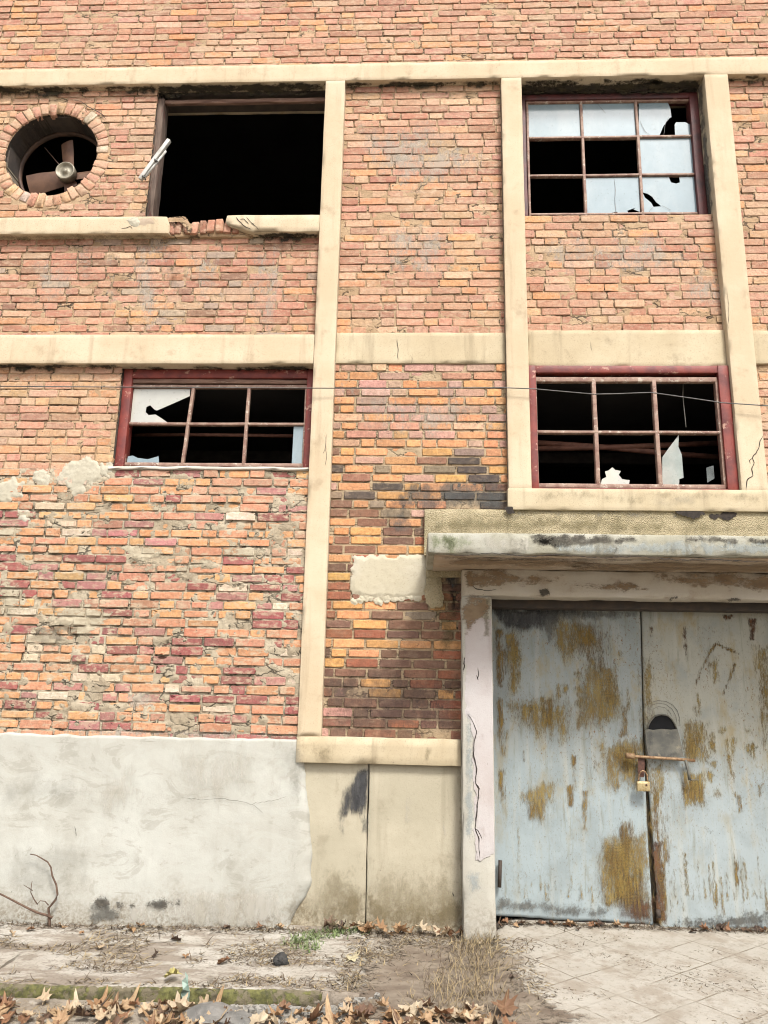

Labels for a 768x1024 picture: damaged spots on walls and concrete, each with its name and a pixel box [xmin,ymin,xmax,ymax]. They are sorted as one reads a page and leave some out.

damp [521,78,712,213]
peeling [168,216,239,237]
peeling [32,469,50,485]
damp [445,540,768,573]
peeling [350,577,444,608]
peeling [465,570,558,597]
peeling [577,582,645,591]
peeling [656,573,768,602]
damp [354,770,368,807]
crack [469,716,482,855]
corrosion [495,615,768,926]